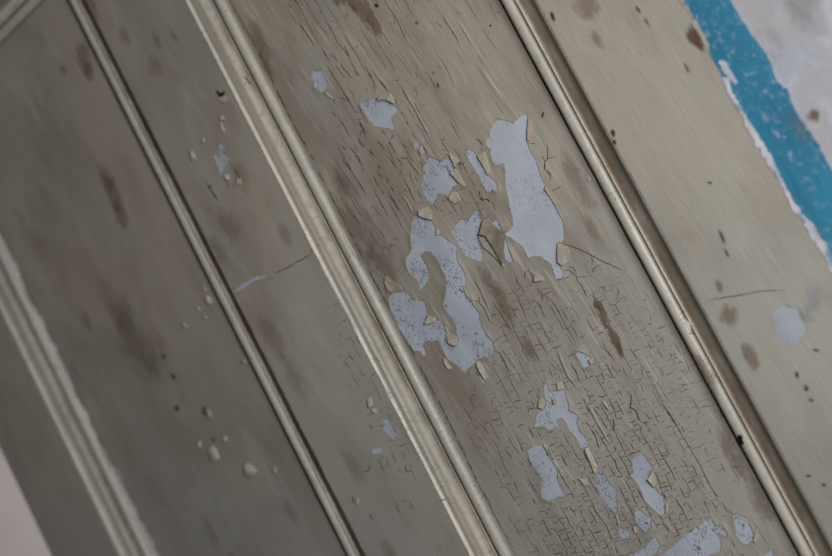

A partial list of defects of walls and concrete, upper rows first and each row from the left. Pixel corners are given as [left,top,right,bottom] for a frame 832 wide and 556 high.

crack [230,0,500,320]
crack [327,303,416,481]
peeling [360,92,398,130]
peeling [384,114,570,383]
crack [530,143,560,191]
peeling [528,444,565,501]
crack [407,244,740,556]
peeling [535,381,759,556]
peeling [679,0,710,51]
peeling [719,61,832,272]
peeling [773,303,807,345]